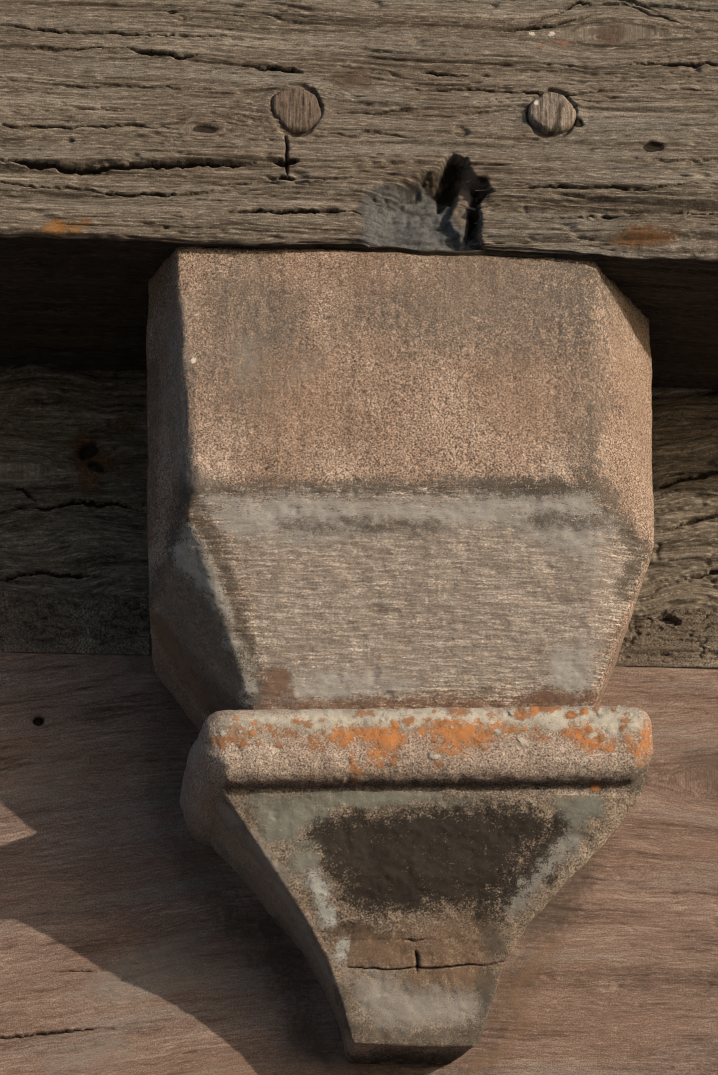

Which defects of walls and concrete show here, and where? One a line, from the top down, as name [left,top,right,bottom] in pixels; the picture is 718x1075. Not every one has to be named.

crack [350,941,495,971]
damp [216,769,648,1065]